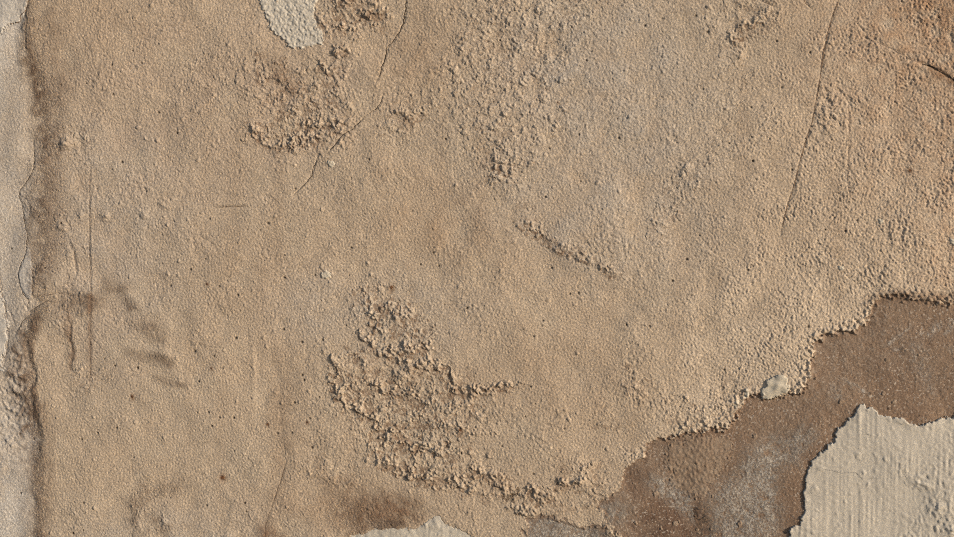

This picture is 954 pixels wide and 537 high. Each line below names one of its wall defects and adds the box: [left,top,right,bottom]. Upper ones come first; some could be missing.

peeling [0,0,28,37]
spalling [168,0,401,168]
crack [294,0,407,195]
crack [781,0,839,231]
peeling [0,291,10,372]
damp [12,316,38,432]
peeling [18,245,33,299]
spalling [321,274,954,537]